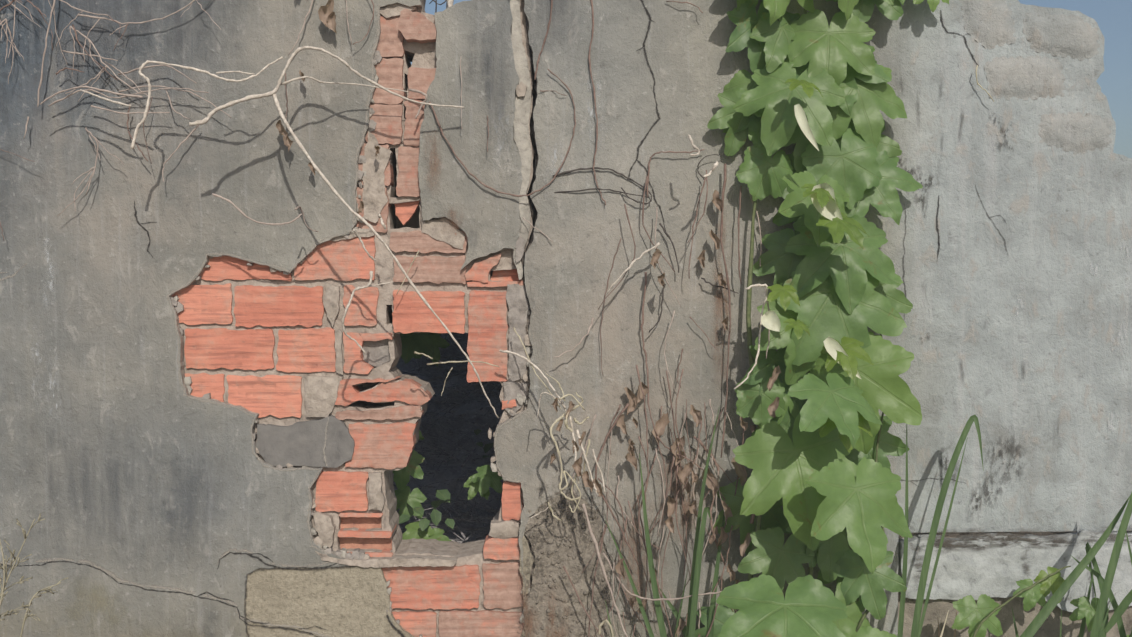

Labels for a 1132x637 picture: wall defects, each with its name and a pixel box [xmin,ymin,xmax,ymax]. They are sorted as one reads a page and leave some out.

crack [940,15,979,66]
crack [628,0,666,231]
crack [134,201,157,258]
crack [510,0,537,412]
flaking render [167,4,613,637]
crack [0,558,329,637]
crack [216,549,336,570]
damp [935,533,1063,548]